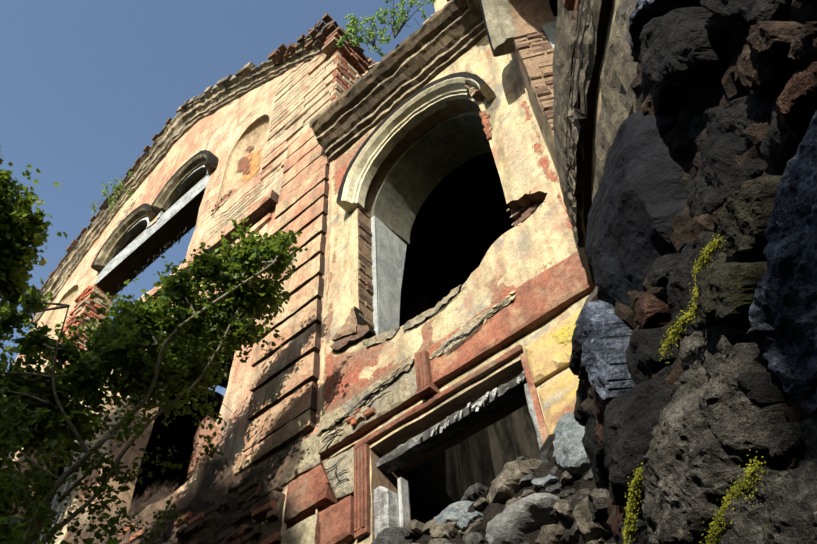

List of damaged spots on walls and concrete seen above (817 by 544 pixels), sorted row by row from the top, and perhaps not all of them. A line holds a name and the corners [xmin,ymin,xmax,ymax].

flaking render [210,42,402,231]
flaking render [463,83,493,140]
flaking render [532,86,587,248]
spalling [507,190,546,227]
flaking render [57,283,108,351]
peeling [316,276,516,438]
crack [318,428,349,490]